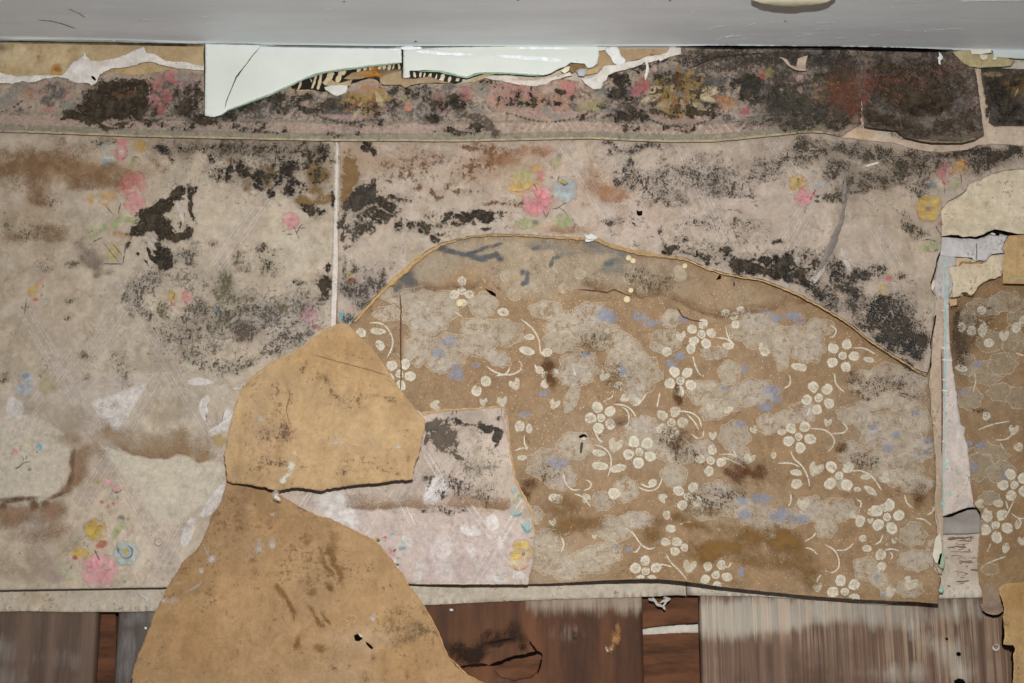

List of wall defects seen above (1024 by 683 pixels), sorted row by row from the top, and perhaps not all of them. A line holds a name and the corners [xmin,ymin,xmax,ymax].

peeling [598,47,625,65]
peeling [324,85,348,96]
damp [0,64,580,390]
damp [522,48,1024,404]
damp [249,422,292,469]
damp [344,407,511,517]
damp [649,426,705,466]
damp [835,440,884,472]
damp [0,394,223,586]
peeling [932,534,945,569]